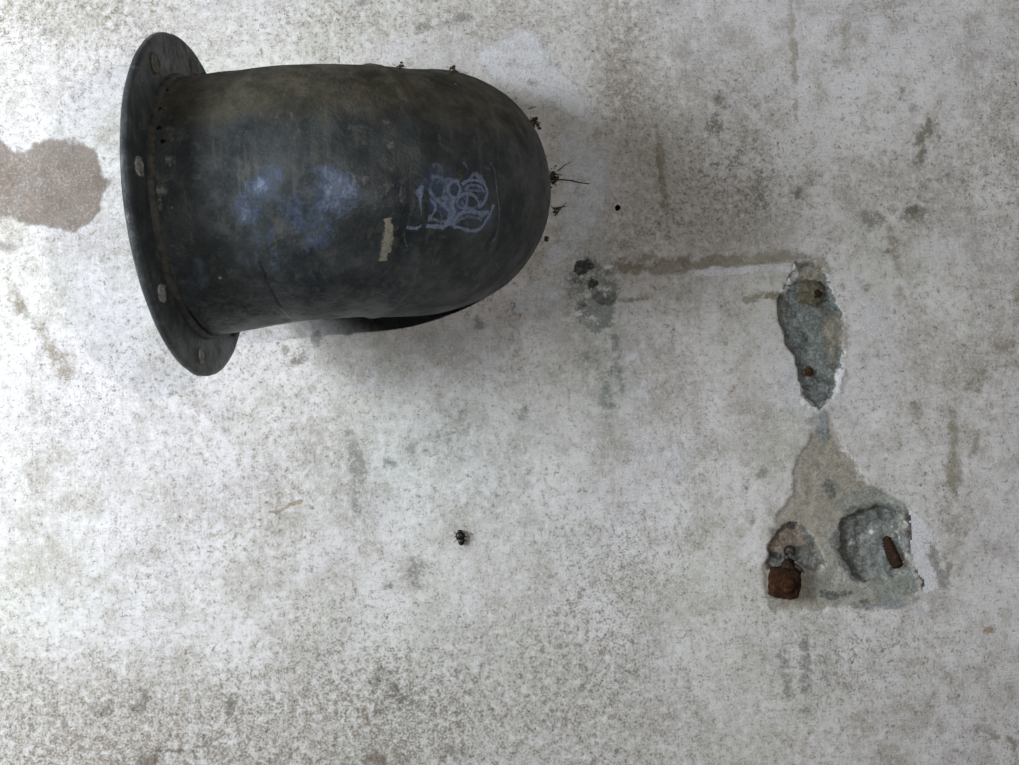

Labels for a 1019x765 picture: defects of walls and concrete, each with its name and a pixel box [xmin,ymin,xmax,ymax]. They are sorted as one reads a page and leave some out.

damp [0,139,107,232]
spalling [777,258,847,441]
spalling [767,521,826,571]
spalling [830,503,909,583]